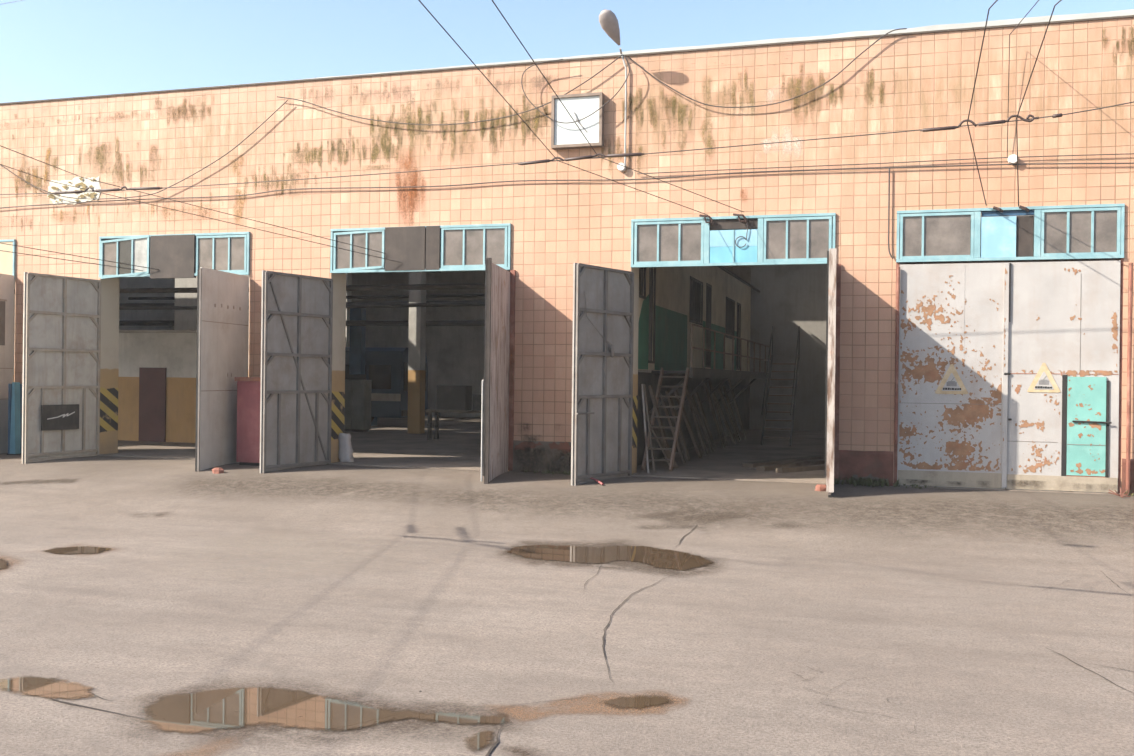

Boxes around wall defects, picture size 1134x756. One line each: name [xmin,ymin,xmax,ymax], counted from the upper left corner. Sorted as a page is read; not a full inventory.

leakage [371,108,468,159]
peeling [899,275,1060,473]
peeling [1044,312,1118,475]
crack [49,692,147,720]
crack [485,579,662,756]